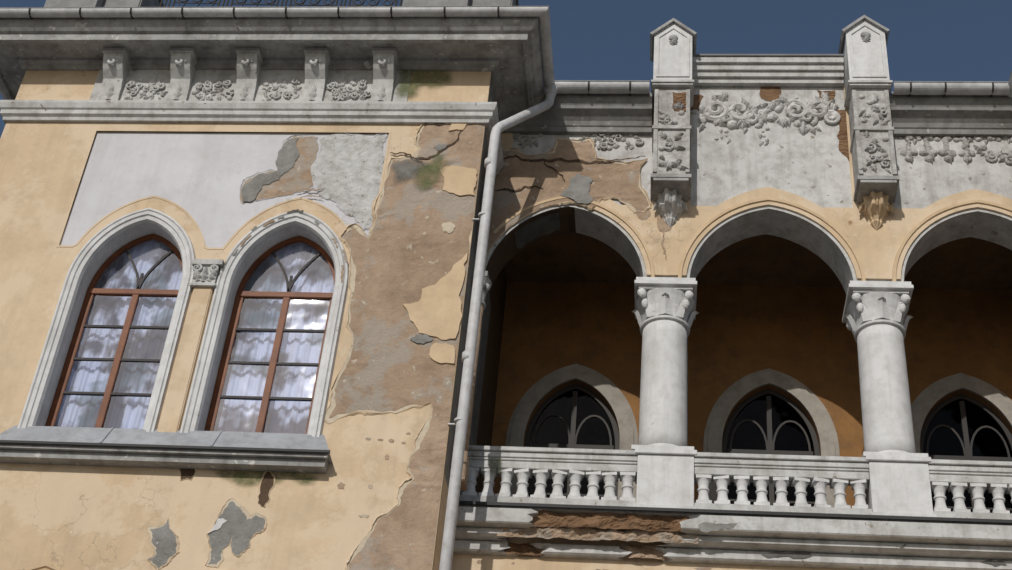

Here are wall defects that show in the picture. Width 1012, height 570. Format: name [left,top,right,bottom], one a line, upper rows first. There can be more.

water stain [398,70,449,96]
flaking render [759,87,781,101]
crack [495,155,645,192]
peeling [220,209,304,270]
spalling [487,137,673,297]
spalling [239,123,484,570]
flaking render [147,519,180,570]
flaking render [205,471,276,568]